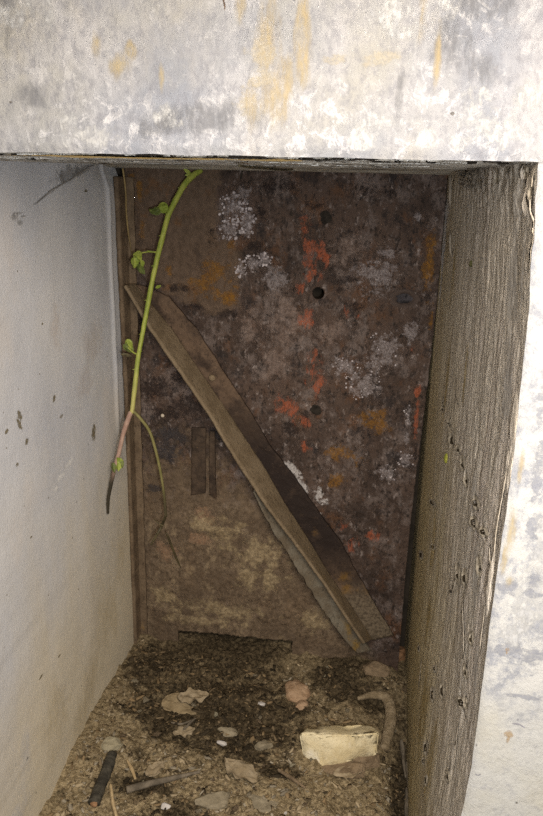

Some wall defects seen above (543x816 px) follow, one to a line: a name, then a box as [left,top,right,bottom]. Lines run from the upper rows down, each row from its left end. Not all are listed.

peeling [153,105,182,127]
peeling [0,112,513,190]
peeling [451,87,529,151]
rust [141,371,203,418]